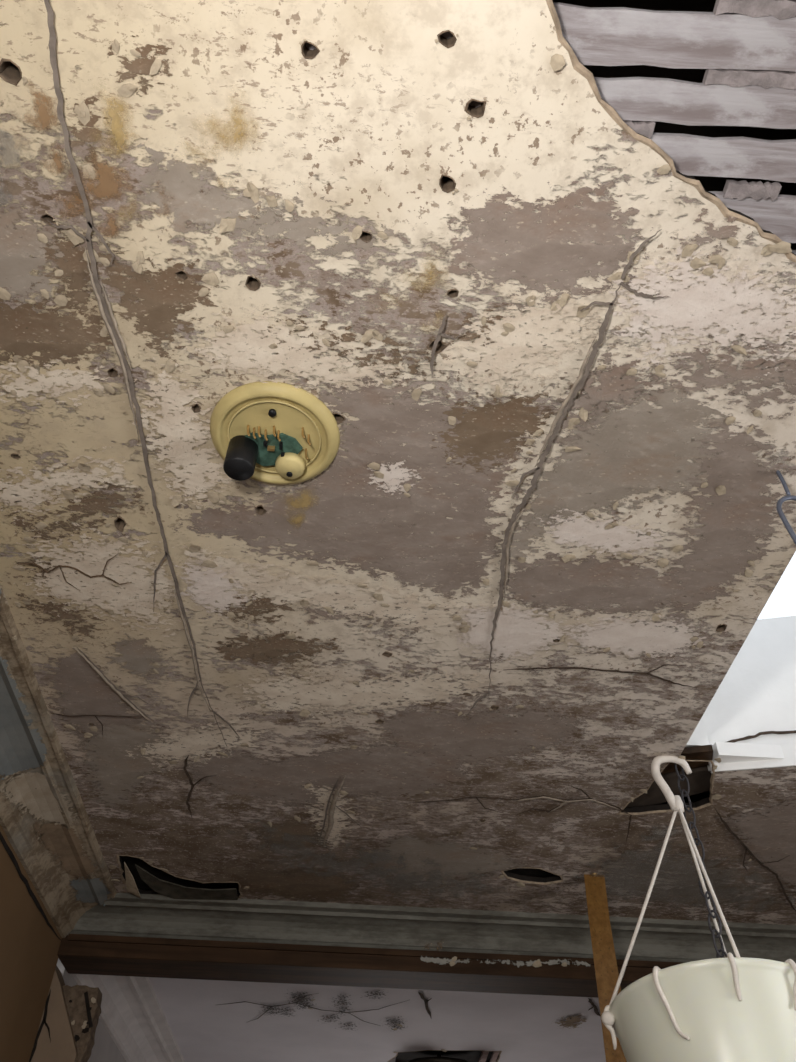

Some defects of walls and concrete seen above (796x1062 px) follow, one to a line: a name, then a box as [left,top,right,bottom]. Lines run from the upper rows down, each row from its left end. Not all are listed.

flaking render [0,58,28,86]
peeling [107,29,173,106]
flaking render [546,0,796,276]
peeling [0,206,223,396]
crack [19,0,240,746]
crack [468,230,696,714]
crack [183,755,217,817]
flaking render [498,867,563,887]
leakage [576,826,795,912]
crack [714,807,796,911]
crack [219,992,432,1026]
flaking render [388,1049,502,1062]